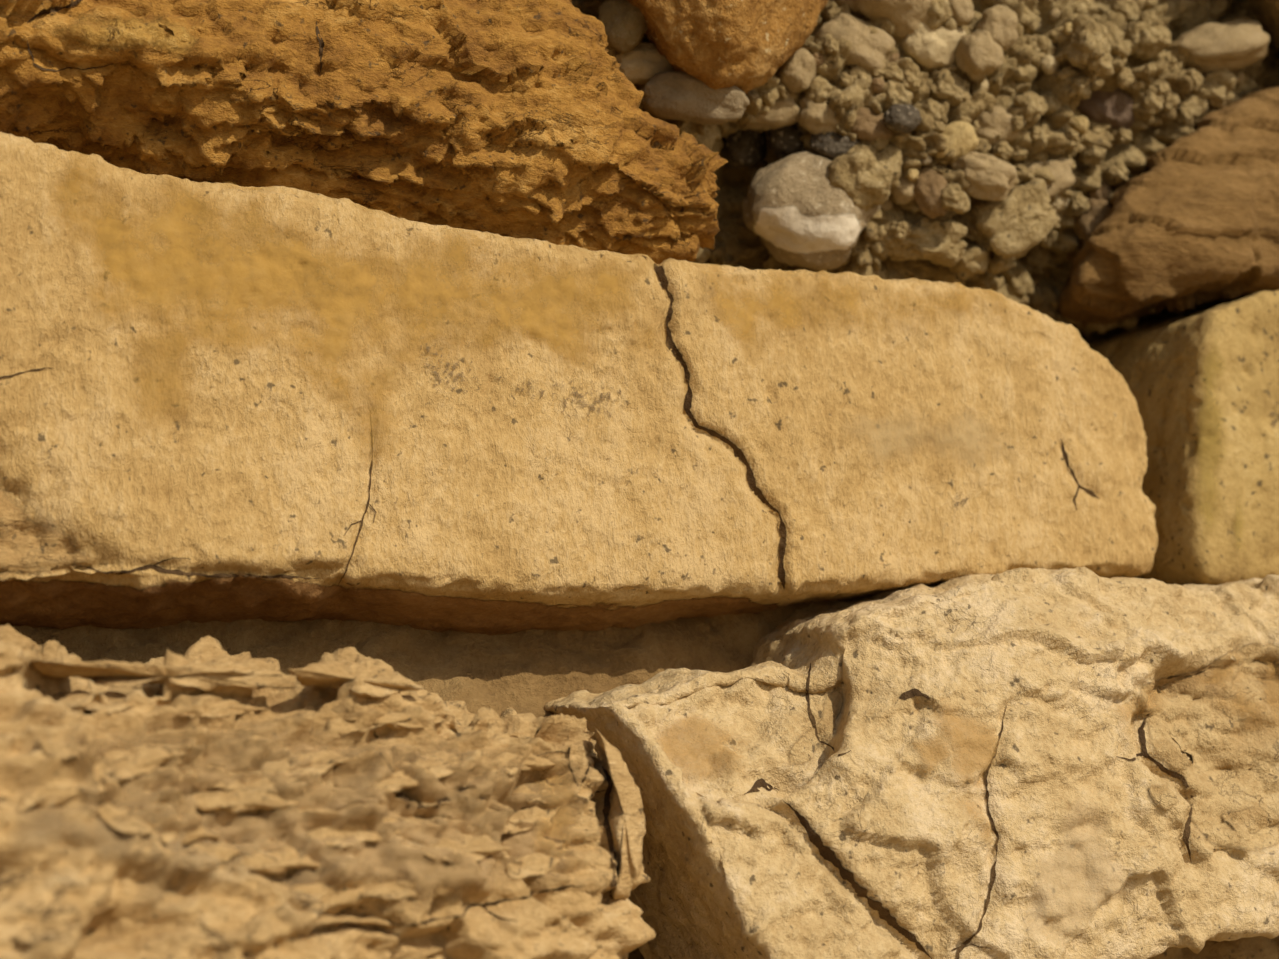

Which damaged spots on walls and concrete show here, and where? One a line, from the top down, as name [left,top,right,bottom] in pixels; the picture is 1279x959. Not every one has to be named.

crack [78,415,376,586]
crack [642,255,787,588]
crack [1061,439,1098,510]
crack [744,709,1006,959]
crack [1116,671,1204,863]